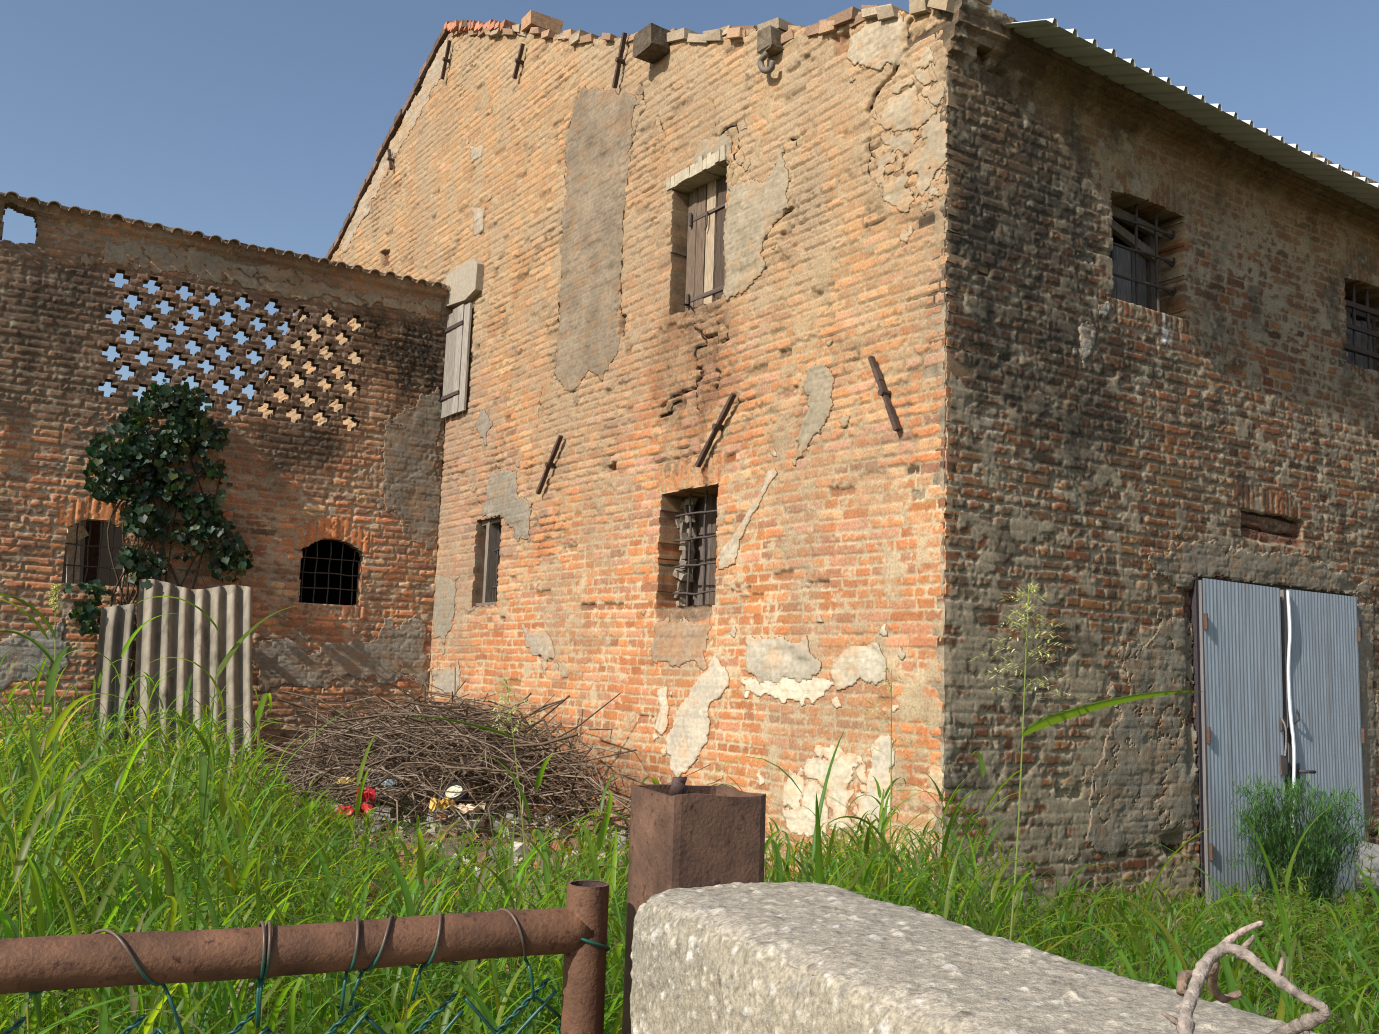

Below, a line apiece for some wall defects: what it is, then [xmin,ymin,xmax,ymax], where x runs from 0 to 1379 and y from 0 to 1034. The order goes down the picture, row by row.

crack [867,66,899,174]
peeling [836,12,949,243]
peeling [689,119,791,315]
crack [661,303,730,418]
peeling [718,340,850,570]
peeling [641,607,906,784]
peeling [782,734,901,853]